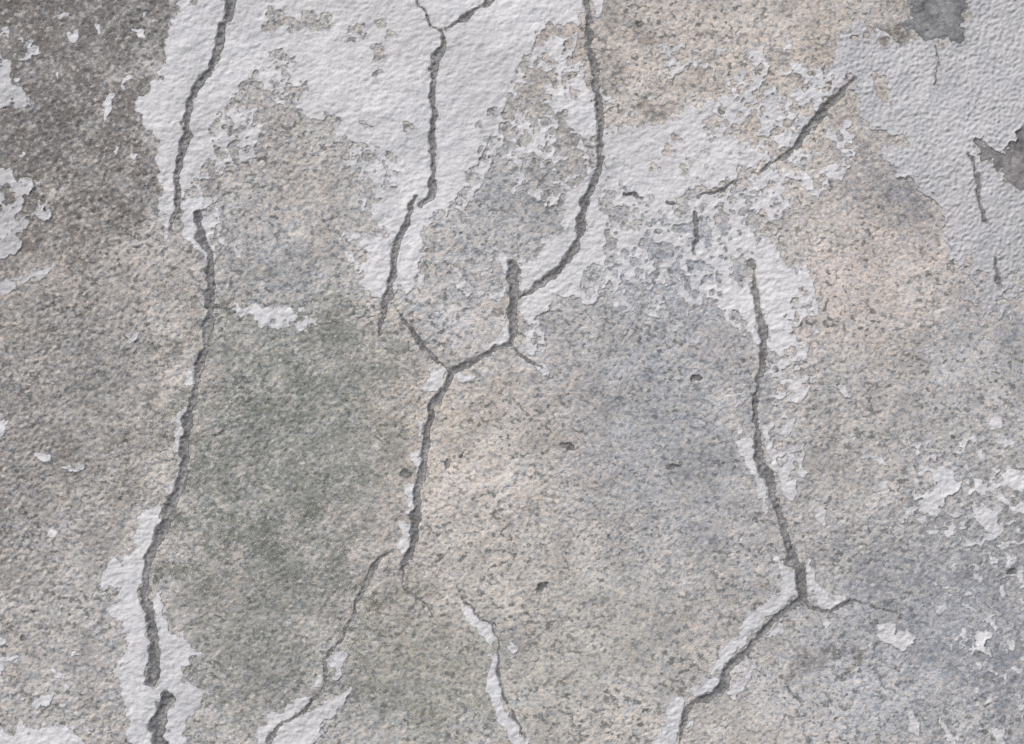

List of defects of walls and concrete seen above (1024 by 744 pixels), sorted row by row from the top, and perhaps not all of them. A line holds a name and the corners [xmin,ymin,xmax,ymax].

peeling [0,168,52,259]
peeling [0,263,55,296]
crack [139,0,236,744]
crack [266,0,618,744]
peeling [135,0,1024,515]
crack [692,76,856,248]
peeling [20,668,70,710]
peeling [89,505,210,744]
peeling [396,451,421,555]
crack [679,260,901,740]
peeling [872,415,1024,707]
peeling [979,726,1008,744]